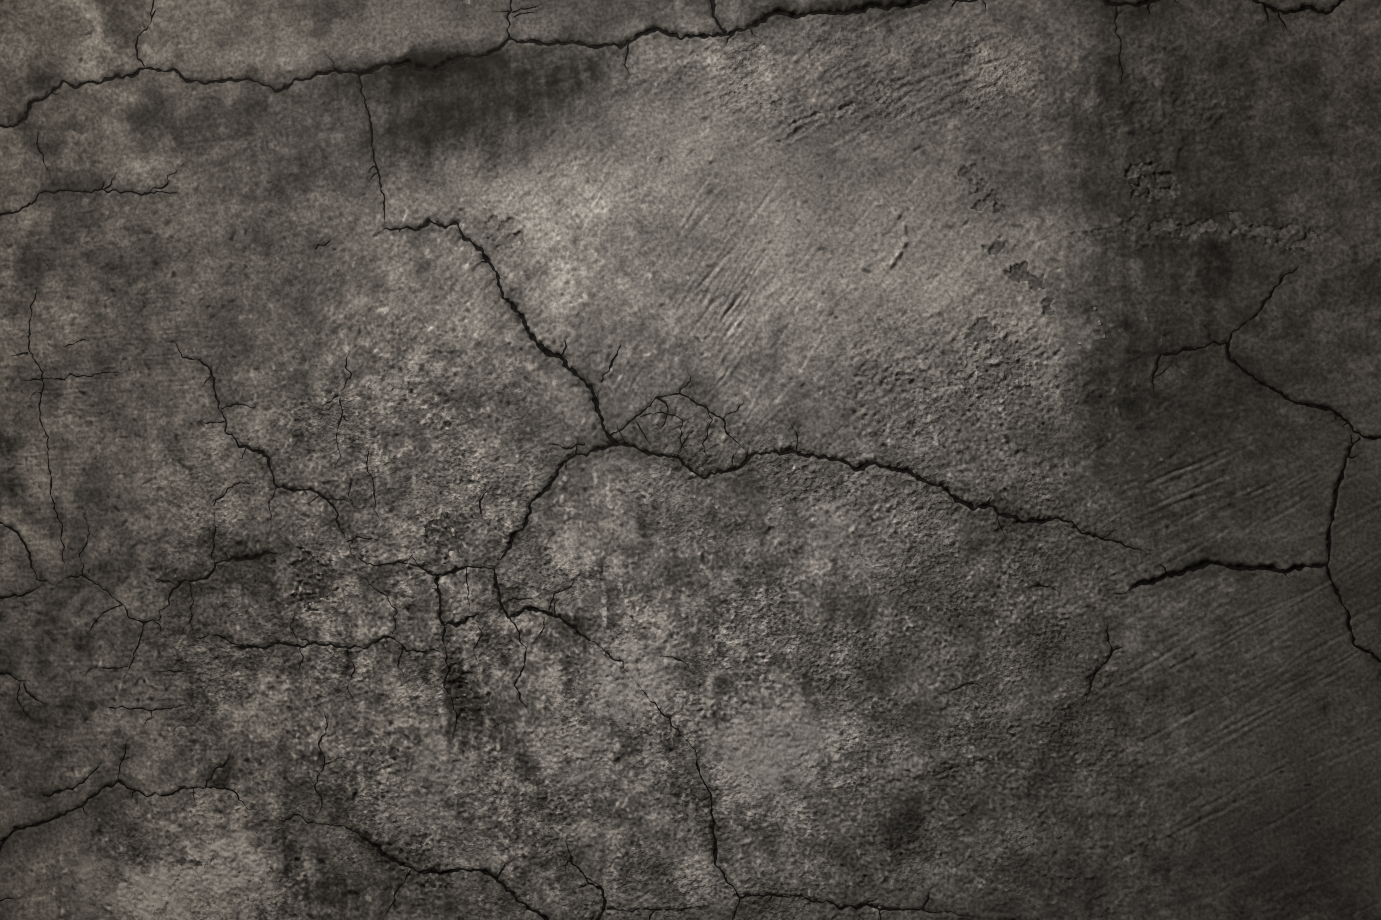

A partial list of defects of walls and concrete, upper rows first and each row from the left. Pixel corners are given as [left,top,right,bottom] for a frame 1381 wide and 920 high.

crack [1105,0,1180,90]
crack [1253,0,1344,30]
crack [0,0,1147,740]
crack [1116,261,1381,677]
crack [0,704,549,920]
crack [565,839,702,920]
crack [635,681,958,920]